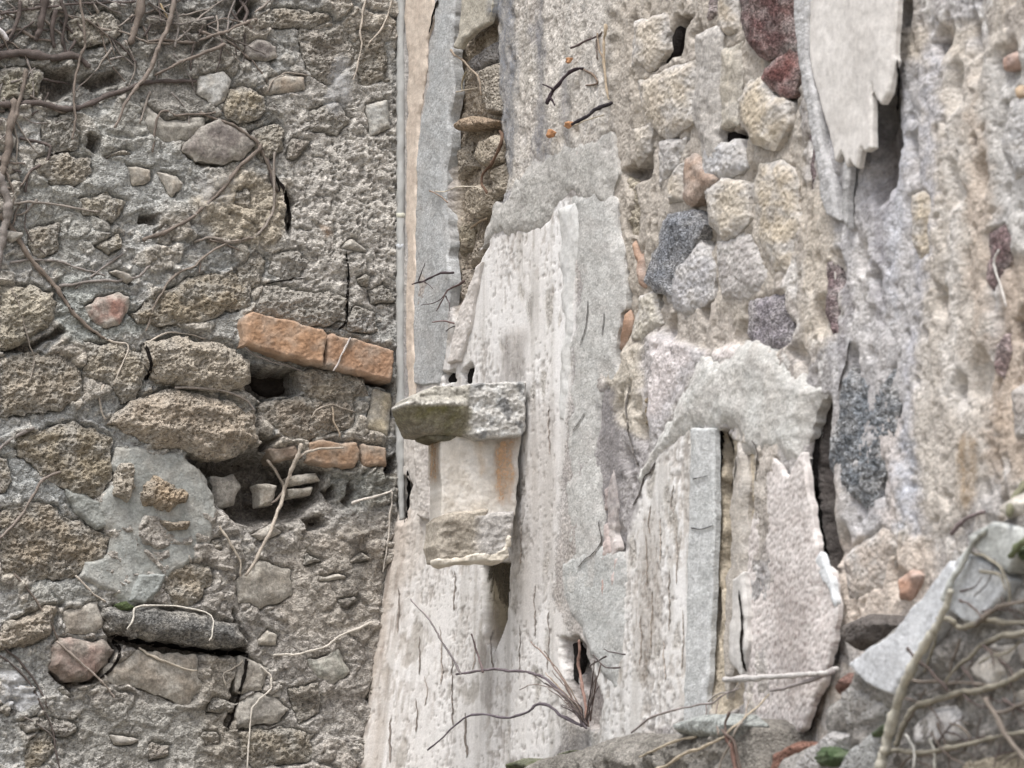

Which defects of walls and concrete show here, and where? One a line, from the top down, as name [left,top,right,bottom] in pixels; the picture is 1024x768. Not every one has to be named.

peeling [794,0,903,229]
crack [263,158,291,230]
spalling [447,0,509,364]
crack [338,251,350,330]
peeling [413,440,430,520]
peeling [601,470,624,595]
crack [693,431,758,497]
crack [811,426,829,558]
crack [100,634,249,731]
peeling [415,625,468,758]
peeling [668,539,684,668]
crack [738,590,747,672]